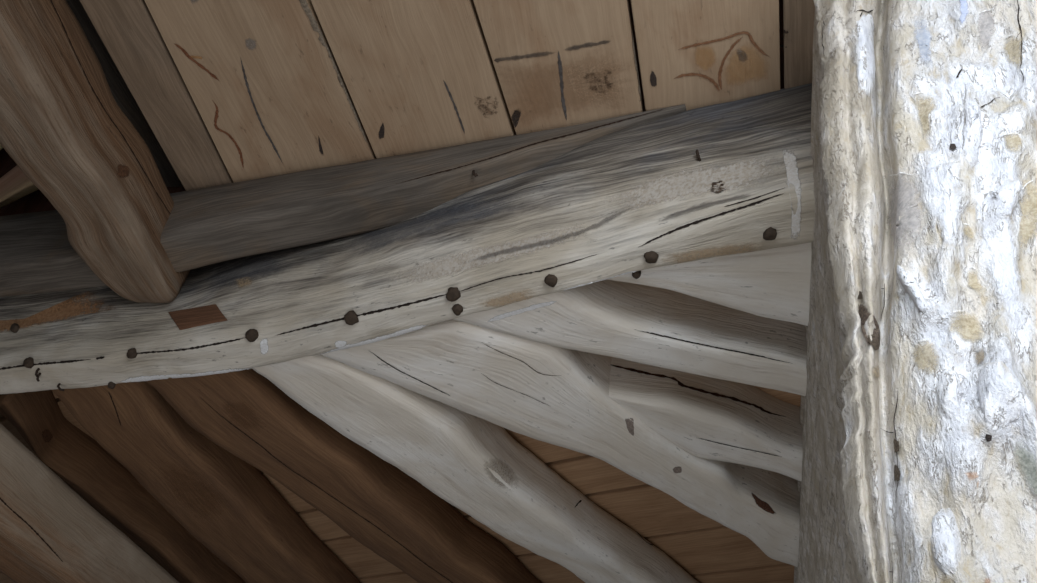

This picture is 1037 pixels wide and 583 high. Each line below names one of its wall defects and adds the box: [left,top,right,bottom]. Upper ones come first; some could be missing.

crack [278,254,597,335]
crack [0,356,104,370]
crack [137,338,243,354]
crack [371,352,450,396]
crack [481,344,562,405]
crack [610,364,786,417]
crack [634,329,793,364]